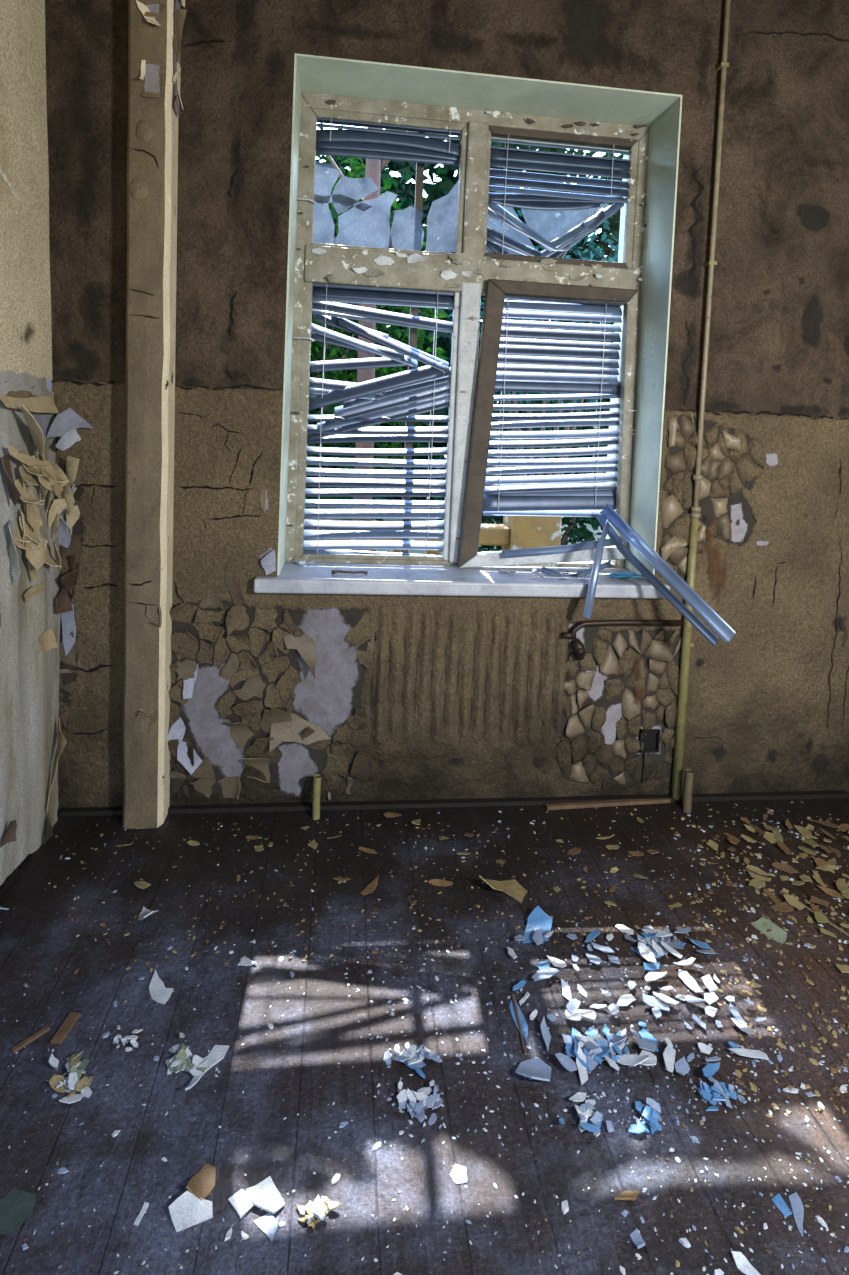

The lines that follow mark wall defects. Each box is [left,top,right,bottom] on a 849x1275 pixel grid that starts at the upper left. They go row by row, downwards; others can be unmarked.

peeling [136,0,187,116]
crack [737,29,849,42]
water stain [675,201,703,297]
water stain [802,297,823,345]
water stain [797,205,830,230]
crack [174,291,283,531]
peeling [660,413,778,577]
peeling [0,371,94,886]
peeling [168,576,376,801]
peeling [555,621,682,789]